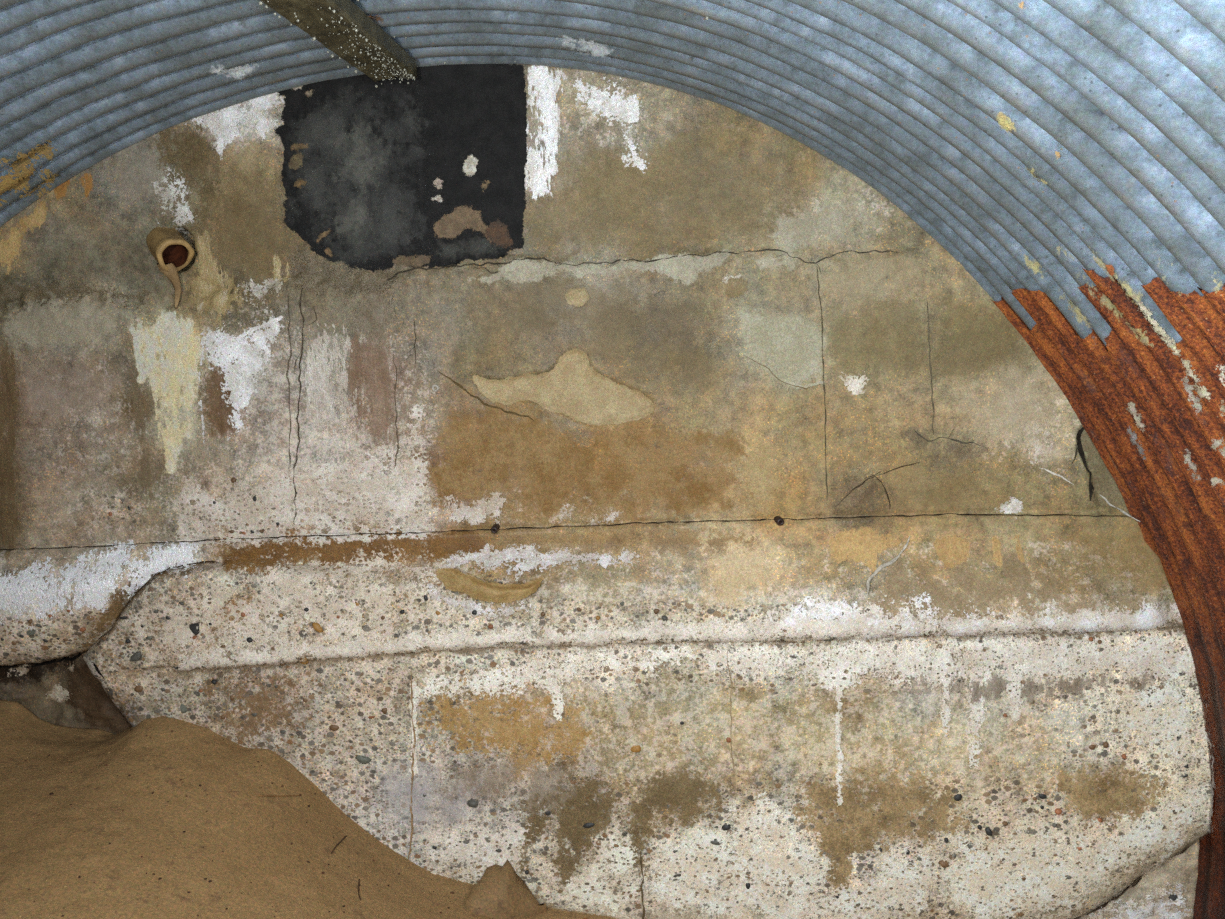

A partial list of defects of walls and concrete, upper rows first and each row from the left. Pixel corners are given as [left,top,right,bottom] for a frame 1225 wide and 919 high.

water stain [0,201,46,274]
water stain [129,92,290,499]
water stain [294,324,360,437]
water stain [468,65,770,330]
crack [384,249,899,289]
water stain [737,307,827,389]
water stain [841,371,869,395]
water stain [1094,259,1140,302]
crack [0,281,1140,692]
corrosion [993,265,1225,919]
water stain [0,405,1215,919]
crack [1073,840,1196,919]